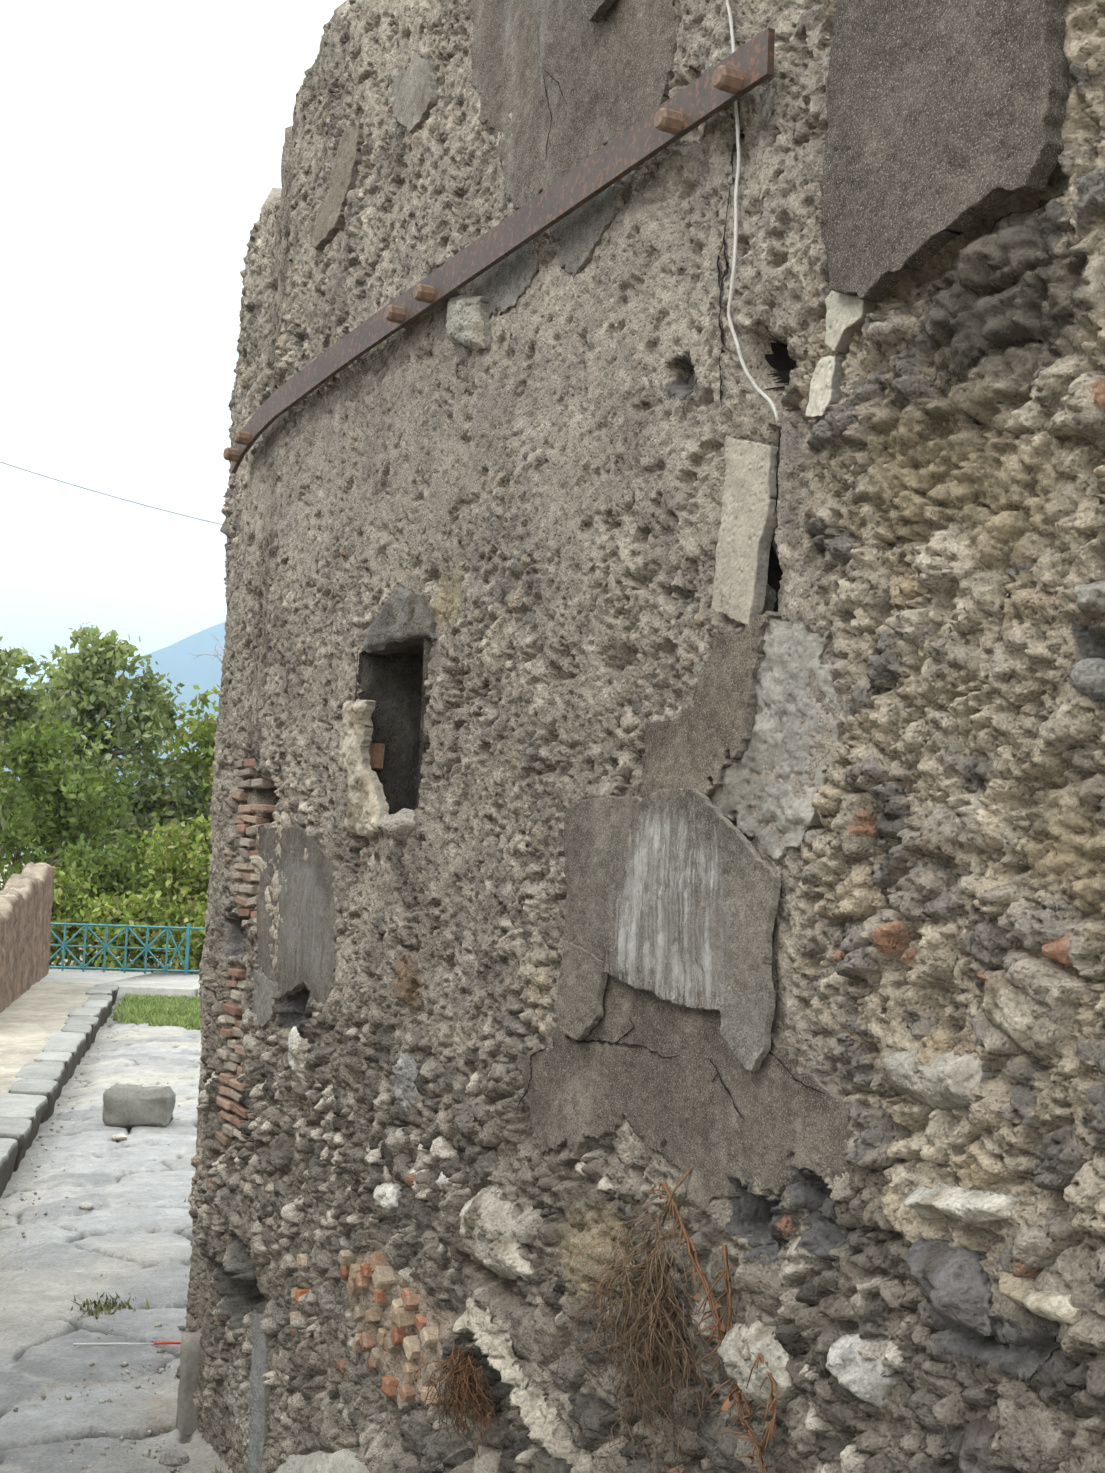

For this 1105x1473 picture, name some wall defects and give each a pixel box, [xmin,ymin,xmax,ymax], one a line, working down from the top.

crack [717,114,745,407]
crack [762,335,796,612]
spalling [1070,617,1105,709]
crack [517,1018,744,1119]
peeling [208,1223,370,1473]
flaking render [338,1250,442,1404]
spalling [466,1348,519,1408]
spalling [922,1301,1061,1381]
spalling [531,1439,574,1473]